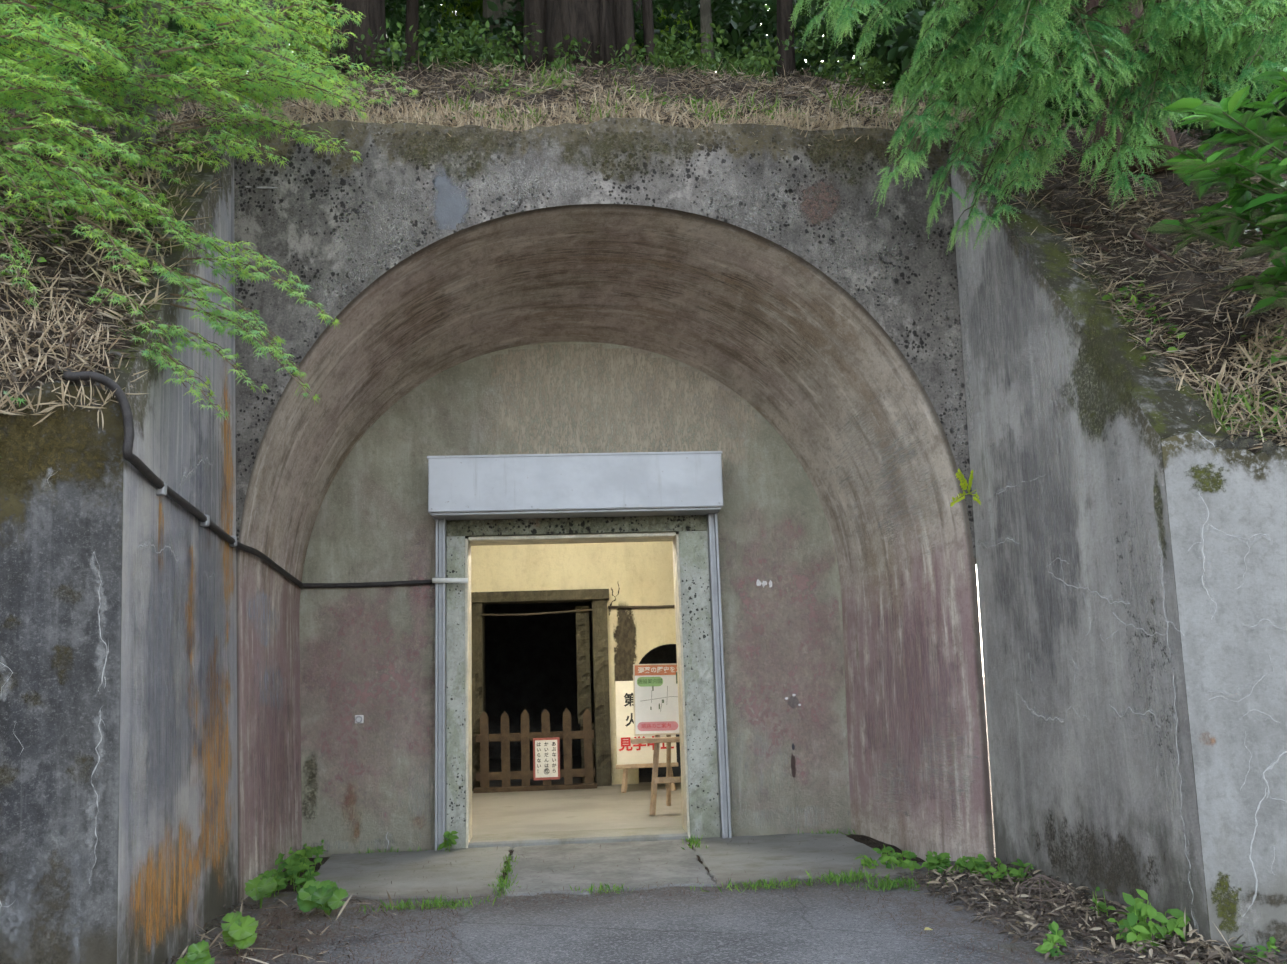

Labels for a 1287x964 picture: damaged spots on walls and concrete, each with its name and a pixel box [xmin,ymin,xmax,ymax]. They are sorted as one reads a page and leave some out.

crack [91,556,109,867]
rust [126,375,234,946]
damp [1035,815,1159,903]
crack [1021,493,1271,924]
crack [1212,619,1287,915]